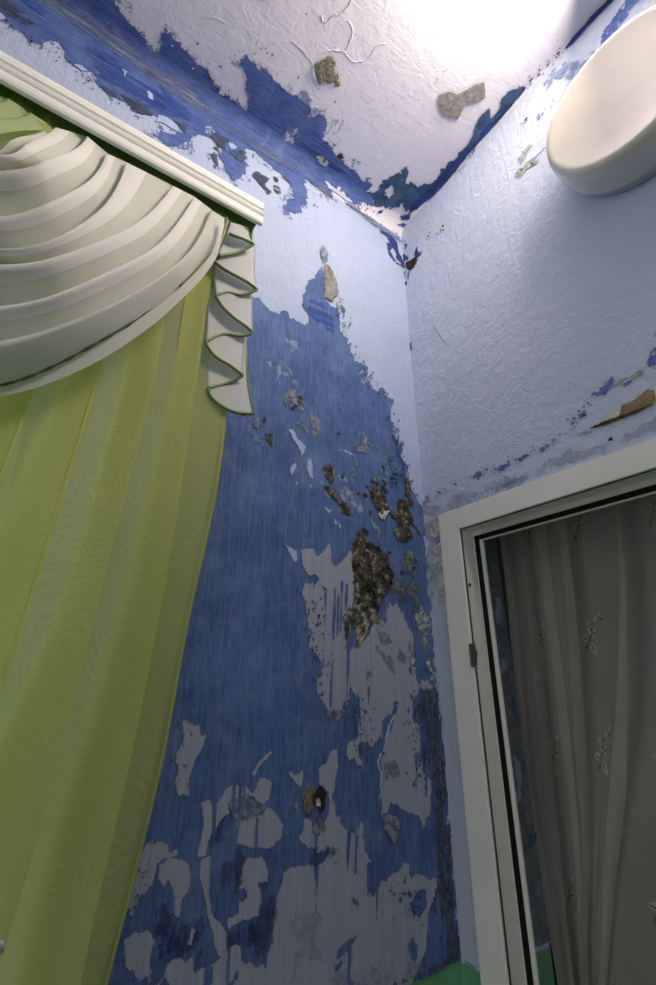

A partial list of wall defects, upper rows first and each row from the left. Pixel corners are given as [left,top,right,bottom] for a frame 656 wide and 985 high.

peeling [0,0,656,285]
peeling [108,245,656,985]
water stain [388,506,461,985]
water stain [448,476,528,510]